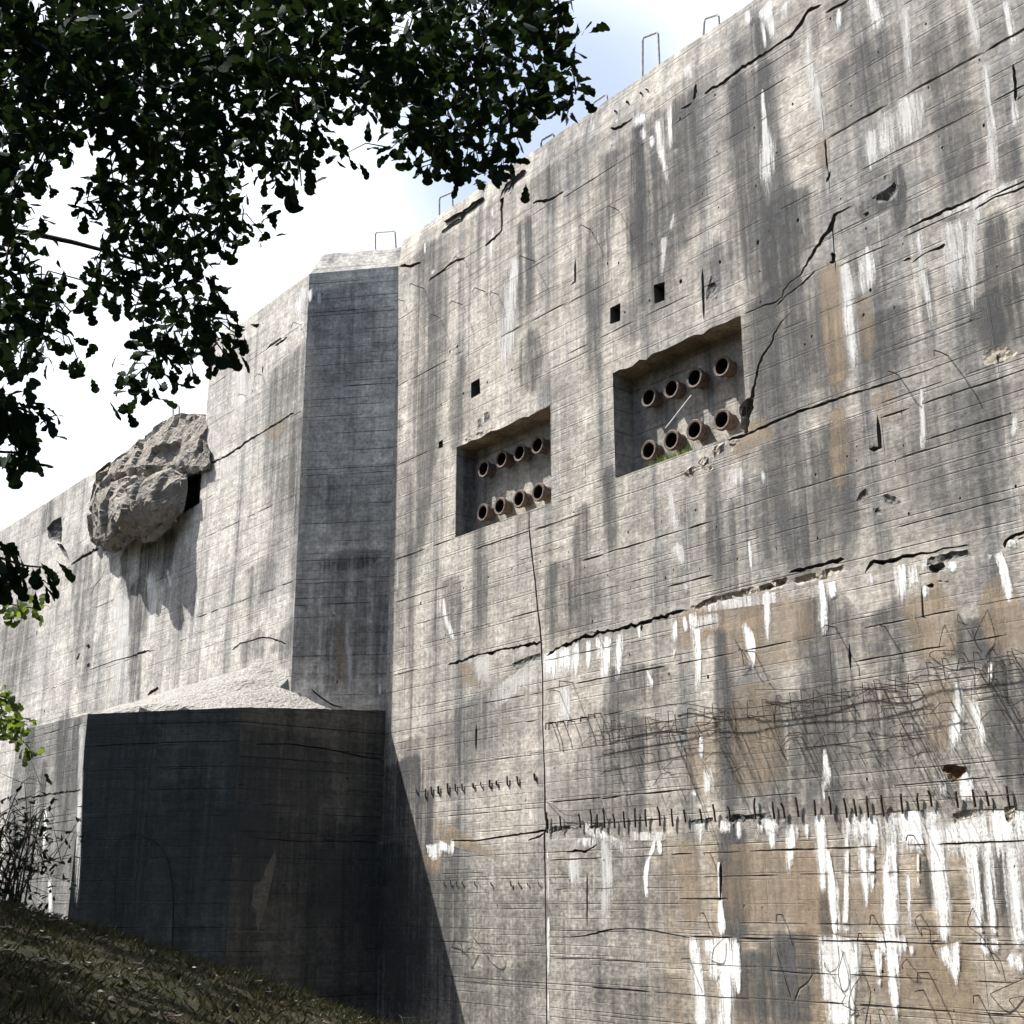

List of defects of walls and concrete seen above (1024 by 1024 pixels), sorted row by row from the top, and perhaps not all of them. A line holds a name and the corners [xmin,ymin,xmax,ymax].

crack [681,0,849,109]
crack [441,170,564,245]
water stain [585,66,699,358]
water stain [715,0,906,423]
spalling [863,175,898,217]
crack [728,206,933,441]
spalling [981,345,1018,367]
crack [789,544,969,574]
spalling [926,549,972,588]
efflorescence [989,540,1016,601]
crack [448,510,689,1024]
water stain [672,558,1024,1024]